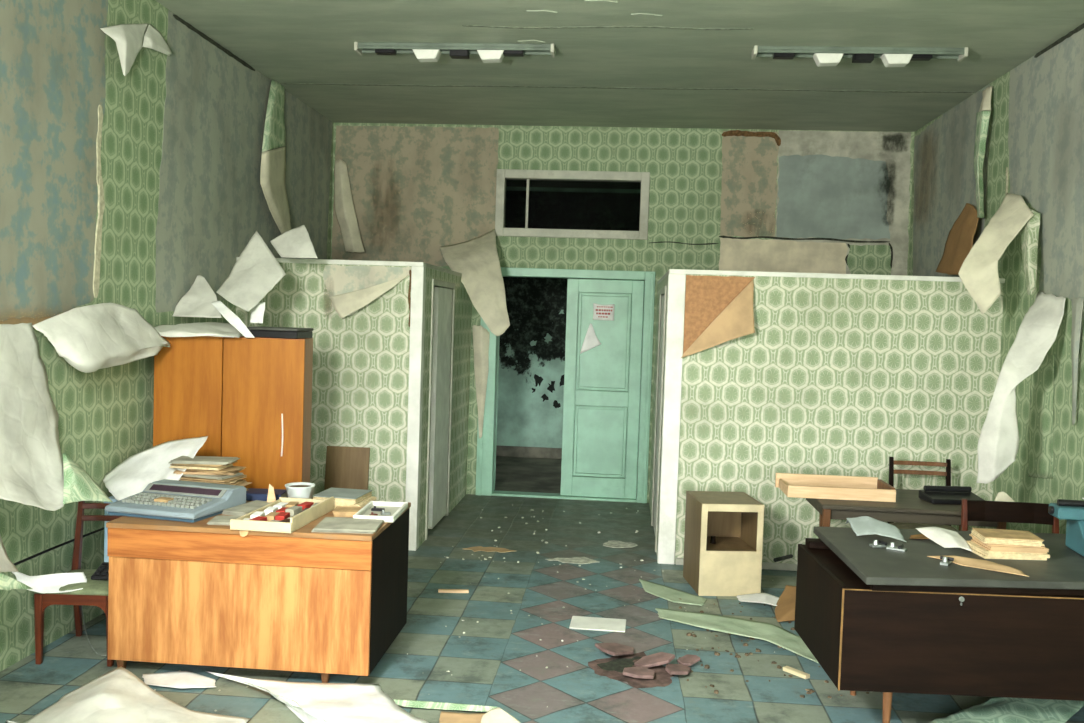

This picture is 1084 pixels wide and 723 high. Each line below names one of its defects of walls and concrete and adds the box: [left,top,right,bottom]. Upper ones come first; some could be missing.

water stain [884,134,905,150]
flaking render [775,130,911,276]
water stain [881,165,895,223]